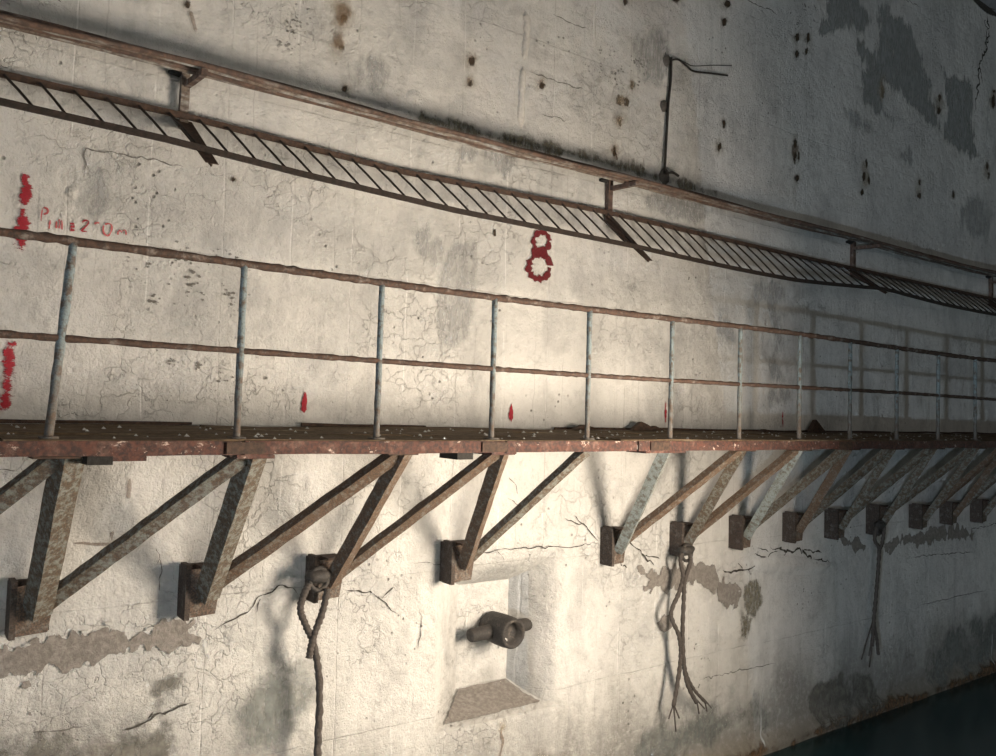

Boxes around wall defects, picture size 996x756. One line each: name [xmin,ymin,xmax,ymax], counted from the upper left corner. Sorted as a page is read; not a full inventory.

peeling [820,0,977,158]
crack [974,0,996,112]
crack [215,585,297,630]
crack [347,588,422,646]
spalling [657,614,672,633]
spalling [637,561,742,609]
crack [723,547,829,574]
spalling [0,616,202,689]
water stain [445,679,539,724]
water stain [809,614,996,735]
water stain [107,721,172,756]
crack [125,702,192,756]